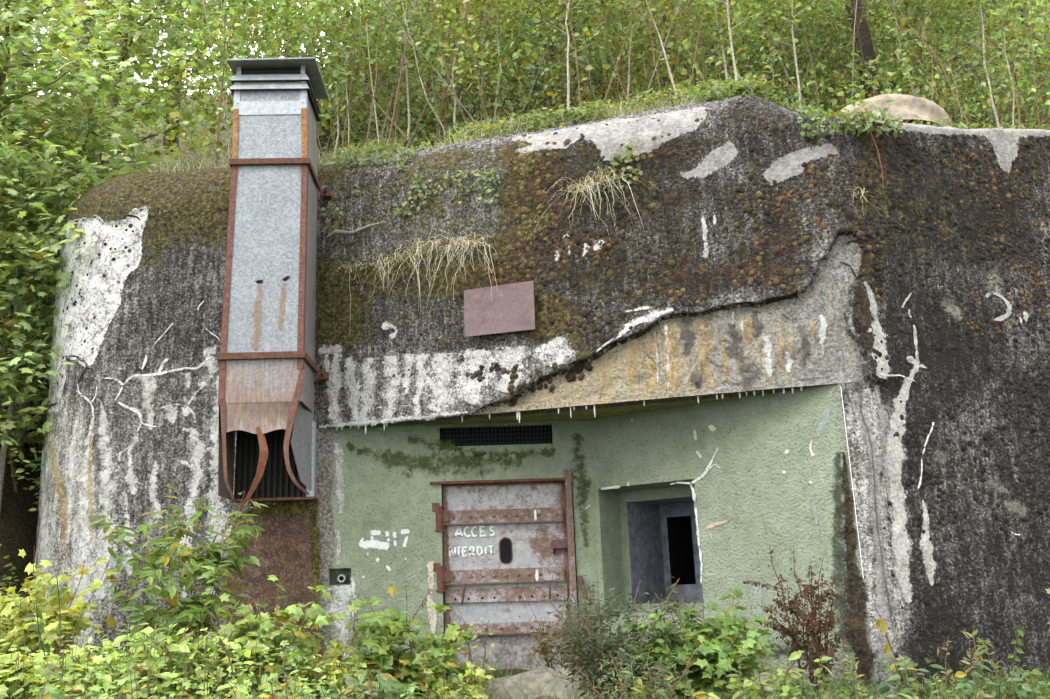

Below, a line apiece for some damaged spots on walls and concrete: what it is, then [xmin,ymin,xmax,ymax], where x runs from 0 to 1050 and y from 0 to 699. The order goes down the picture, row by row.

spalling [47,206,150,413]
crack [46,301,220,431]
rust [252,285,262,350]
water stain [318,337,579,428]
crack [482,292,798,409]
water stain [596,306,695,388]
water stain [725,311,828,390]
crack [840,240,865,282]
water stain [333,436,556,514]
water stain [571,434,591,547]
crack [670,448,721,583]
water stain [883,292,937,603]